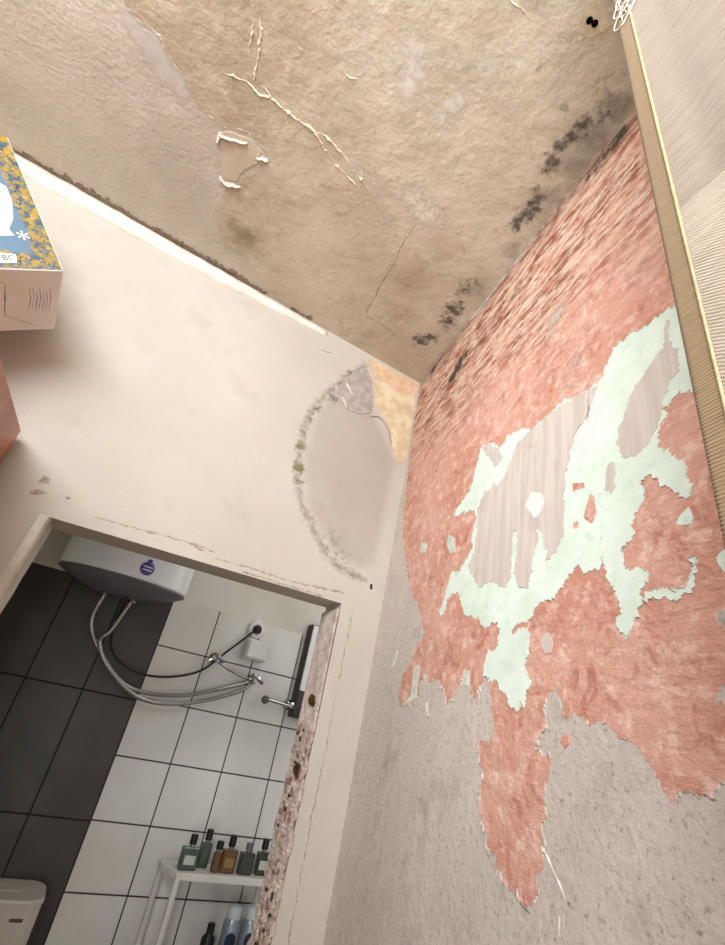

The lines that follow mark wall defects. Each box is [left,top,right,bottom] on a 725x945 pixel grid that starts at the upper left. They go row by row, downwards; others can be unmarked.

crack [223,18,372,194]
damp [544,116,605,173]
damp [586,125,626,181]
peeling [123,0,635,382]
damp [513,189,541,231]
damp [440,279,477,324]
damp [449,353,467,383]
spalling [362,359,419,464]
peeling [398,108,725,913]
spalling [294,723,309,763]
spalling [275,776,297,839]
spalling [254,886,274,945]